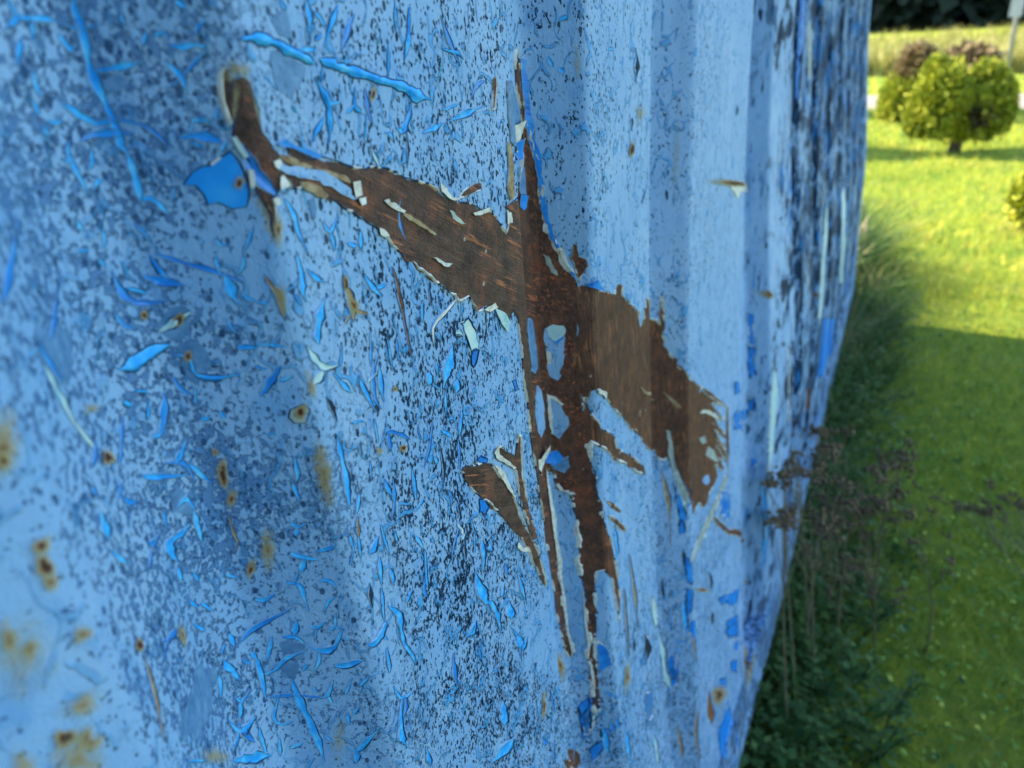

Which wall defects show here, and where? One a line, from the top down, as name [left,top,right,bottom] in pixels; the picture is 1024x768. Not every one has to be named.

peeling [506,80,527,200]
peeling [279,154,357,200]
peeling [402,213,436,235]
peeling [461,317,480,368]
peeling [526,318,569,439]
rust [213,449,235,506]
peeling [479,498,490,515]
peeling [666,430,692,535]
peeling [699,436,719,462]
rust [33,538,58,590]
peeling [683,474,731,643]
peeling [719,588,740,689]